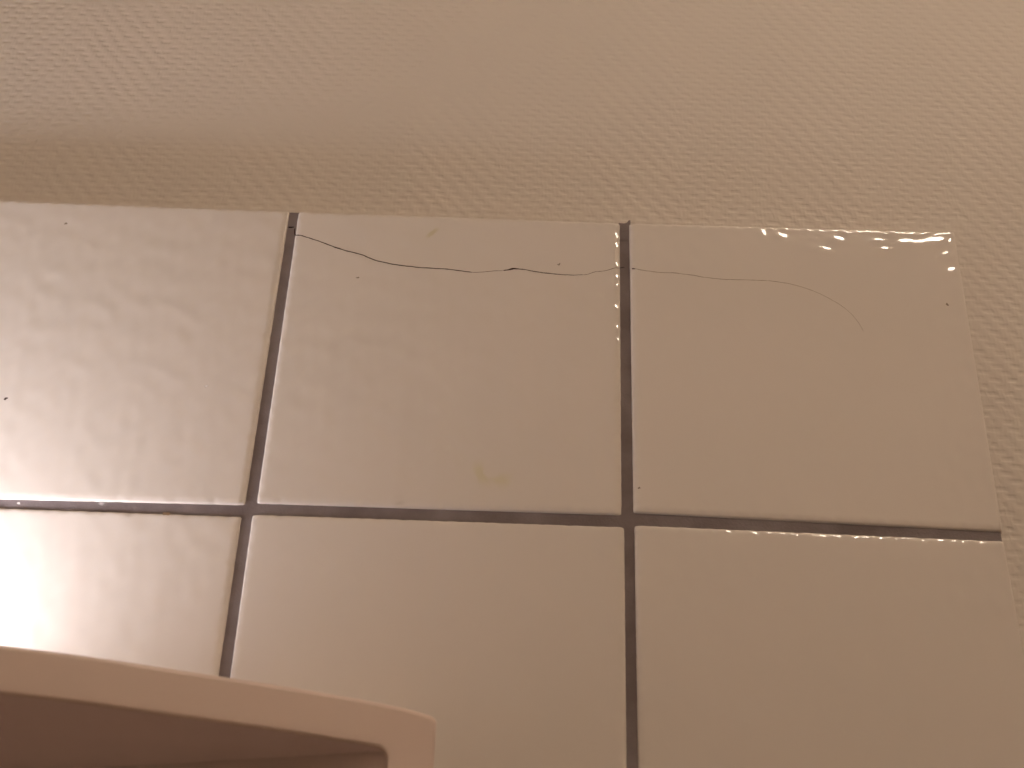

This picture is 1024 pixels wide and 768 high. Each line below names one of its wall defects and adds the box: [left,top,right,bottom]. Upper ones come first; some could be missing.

crack [288,227,863,330]